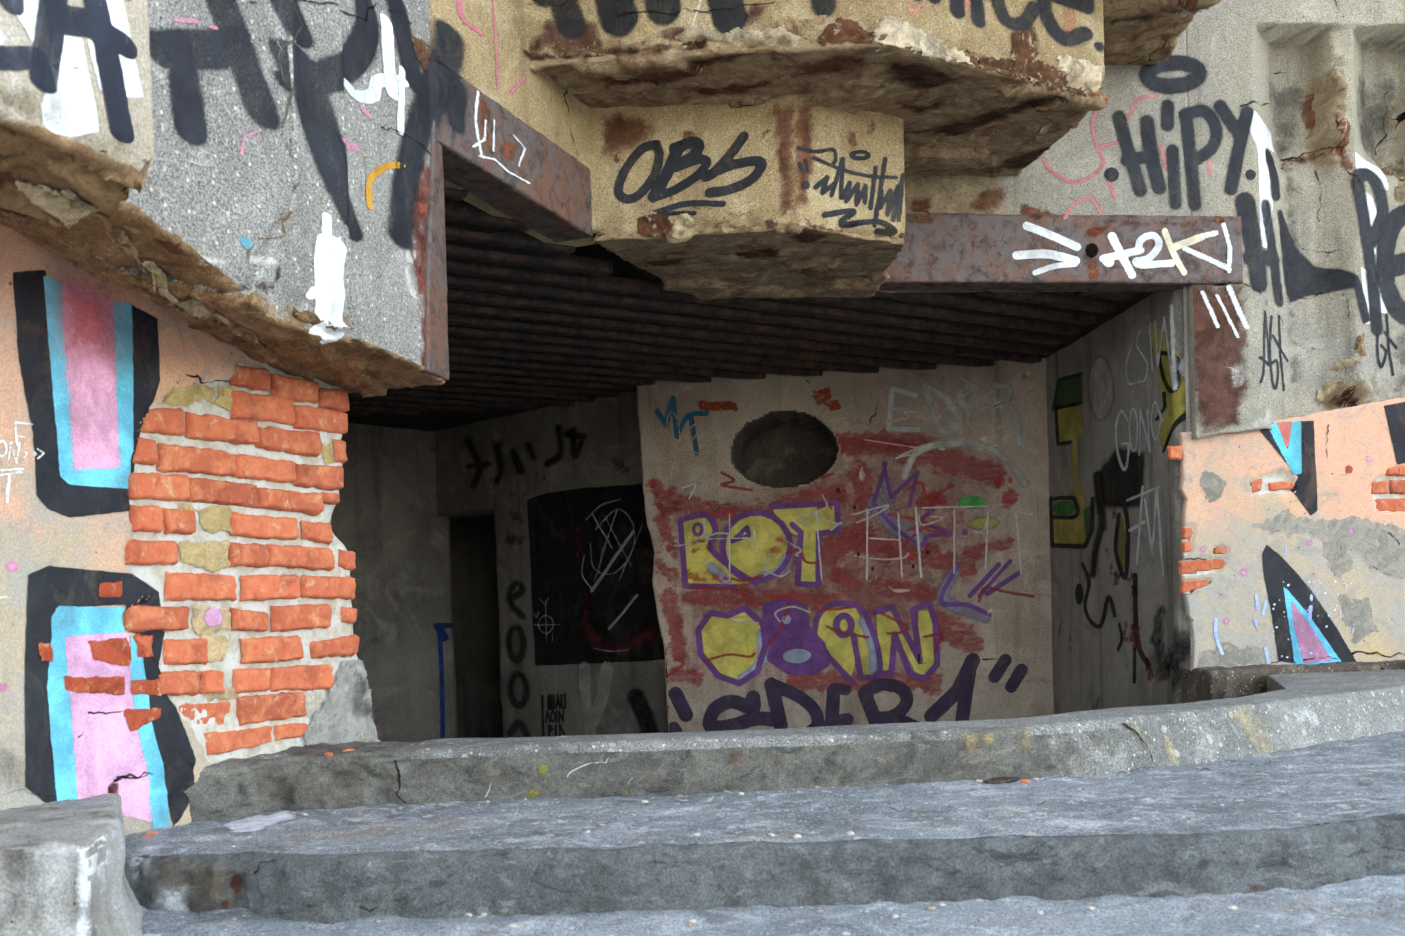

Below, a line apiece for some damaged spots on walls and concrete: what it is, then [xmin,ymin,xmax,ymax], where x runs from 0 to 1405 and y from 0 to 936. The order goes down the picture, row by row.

spalling [675,15,1108,103]
spalling [0,181,276,348]
corrosion [411,166,430,293]
corrosion [604,114,651,162]
corrosion [763,105,814,214]
corrosion [972,189,1004,211]
corrosion [1020,204,1053,219]
corrosion [1193,280,1247,431]
flaking render [123,365,360,755]
flaking render [1178,527,1227,594]
peeling [1250,465,1405,643]
peeling [1197,641,1269,668]